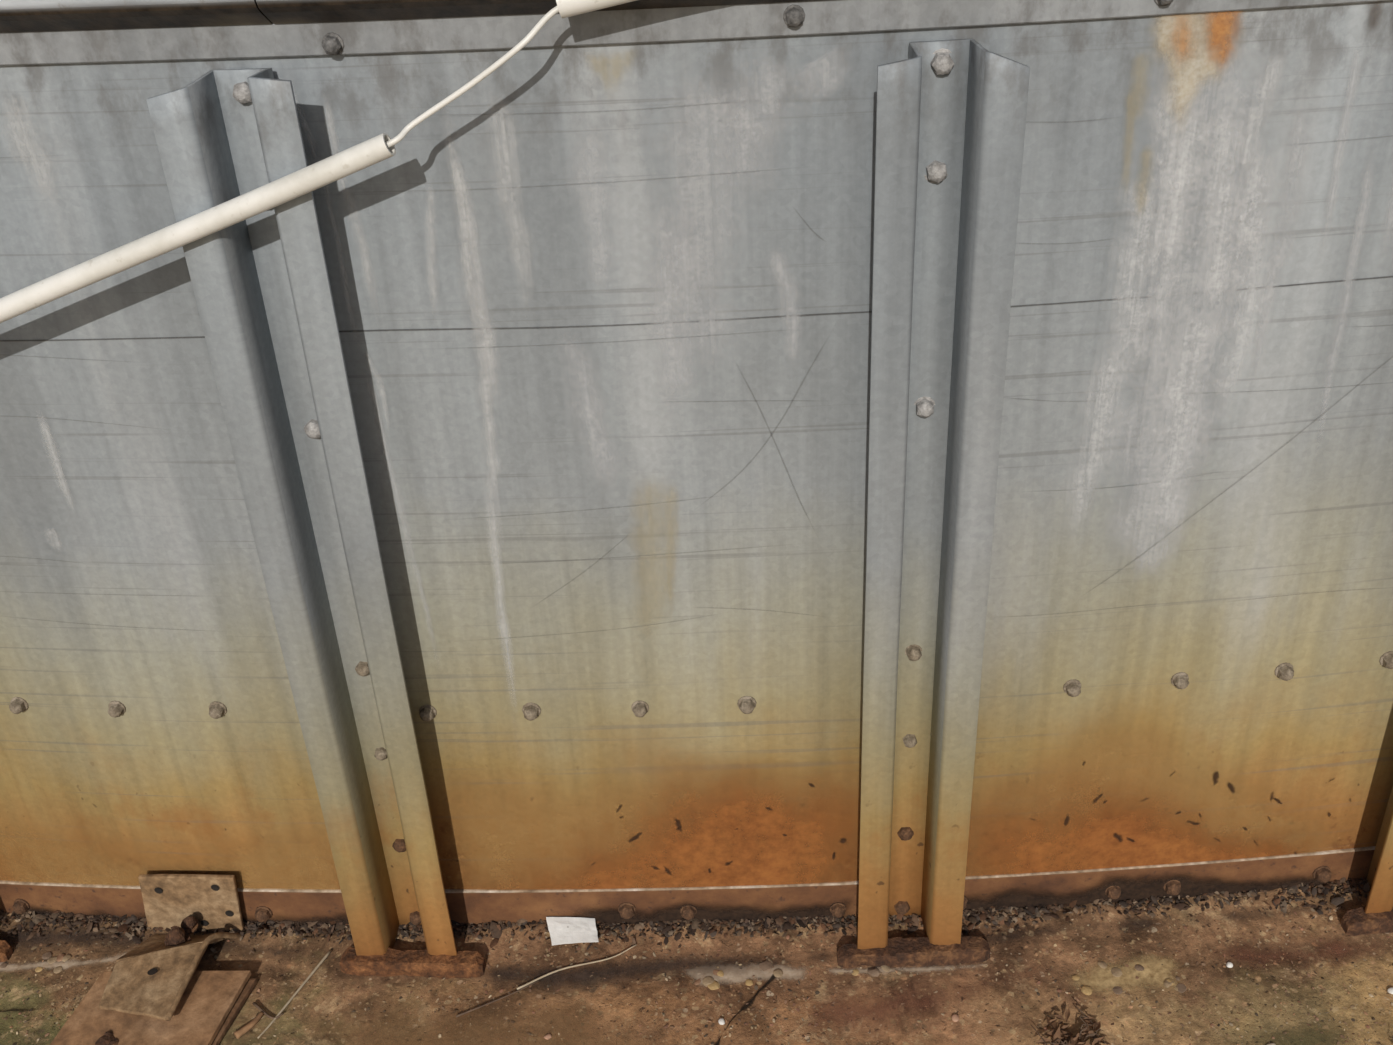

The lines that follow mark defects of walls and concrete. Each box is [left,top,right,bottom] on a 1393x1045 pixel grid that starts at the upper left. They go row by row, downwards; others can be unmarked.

rust [1160,11,1234,105]
leakage [1128,72,1258,557]
rust [467,767,835,890]
rust [975,740,1304,876]
rust [0,940,13,962]
rust [837,936,991,969]
rust [1340,906,1393,936]